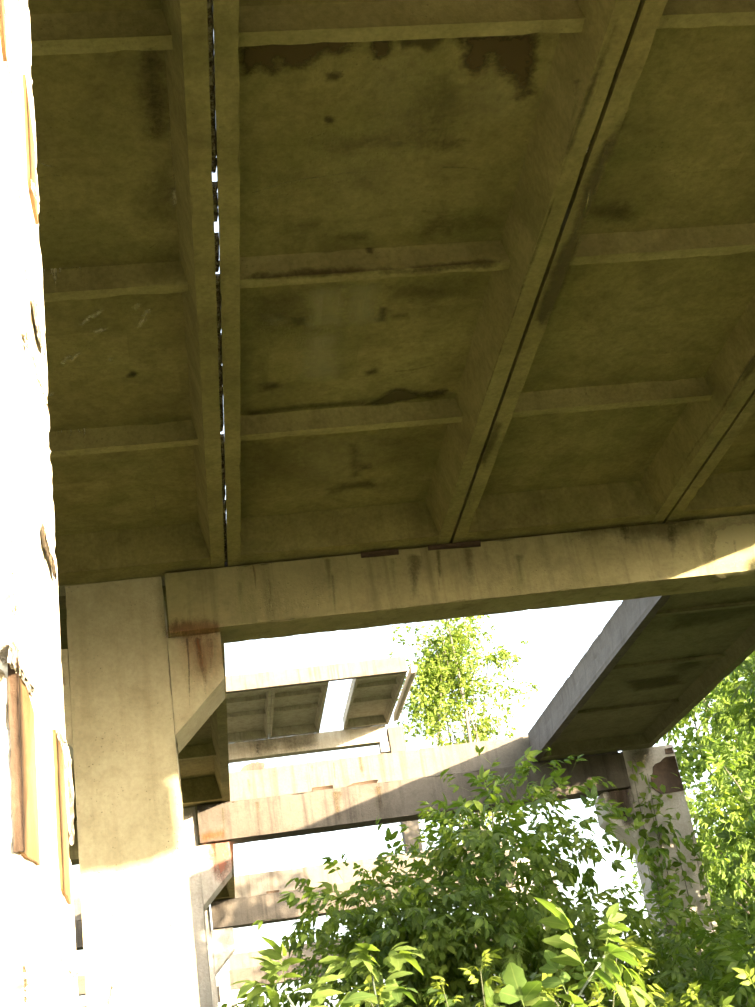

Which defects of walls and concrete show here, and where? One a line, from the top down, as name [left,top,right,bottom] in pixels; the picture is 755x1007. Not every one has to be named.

crack [30,313,49,411]
spalling [41,524,57,580]
corrosion [203,830,232,879]